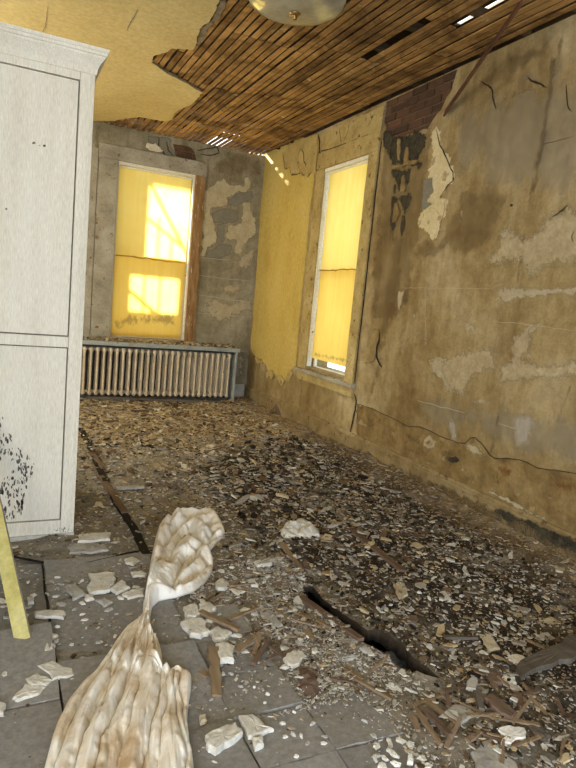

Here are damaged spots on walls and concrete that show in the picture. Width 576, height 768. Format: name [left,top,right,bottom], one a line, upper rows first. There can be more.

spalling [194,1,226,49]
crack [513,77,547,97]
spalling [146,136,219,160]
spalling [383,70,457,241]
peeling [200,134,319,386]
crack [318,106,387,432]
peeling [430,323,576,395]